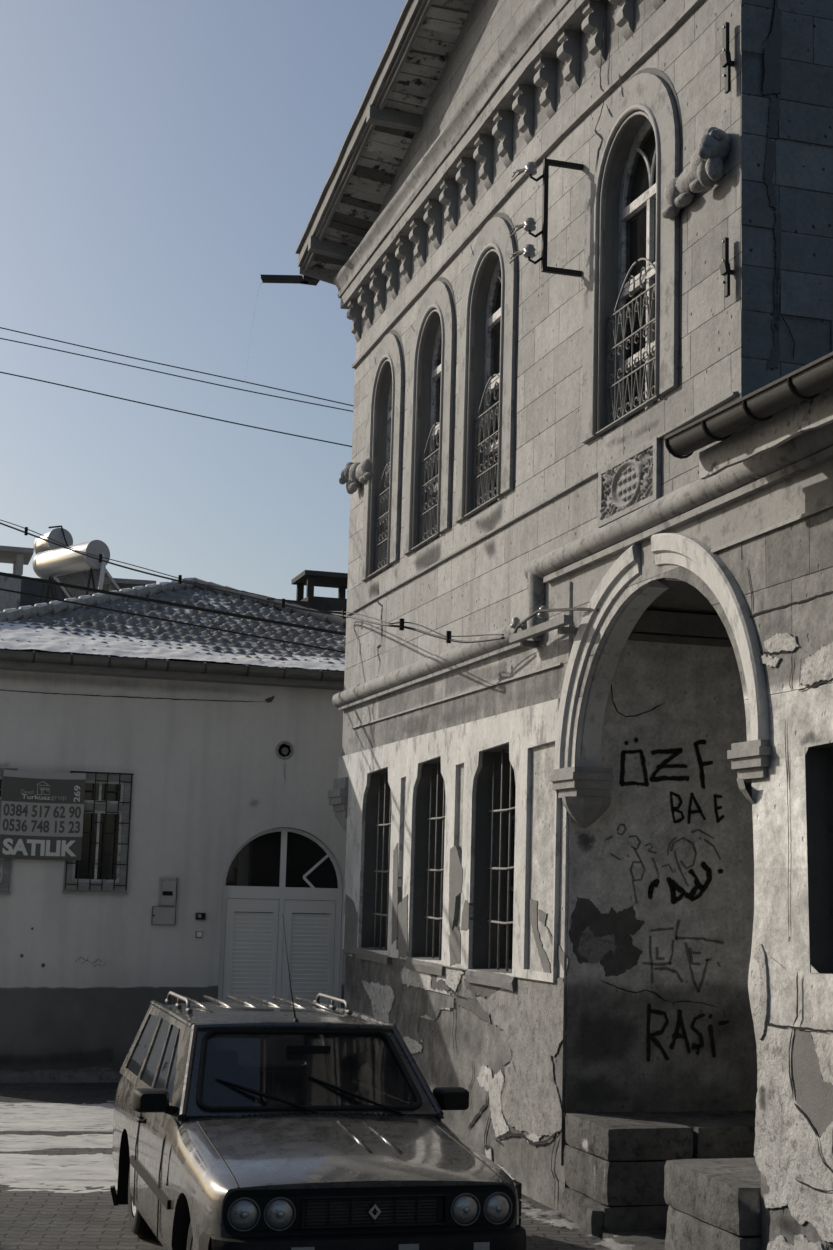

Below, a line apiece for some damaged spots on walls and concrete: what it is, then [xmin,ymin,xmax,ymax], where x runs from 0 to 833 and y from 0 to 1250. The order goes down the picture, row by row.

crack [762,0,776,90]
crack [747,567,833,618]
peeling [759,633,833,686]
crack [760,651,833,691]
crack [783,722,791,930]
peeling [362,843,645,1180]
peeling [754,1025,833,1250]